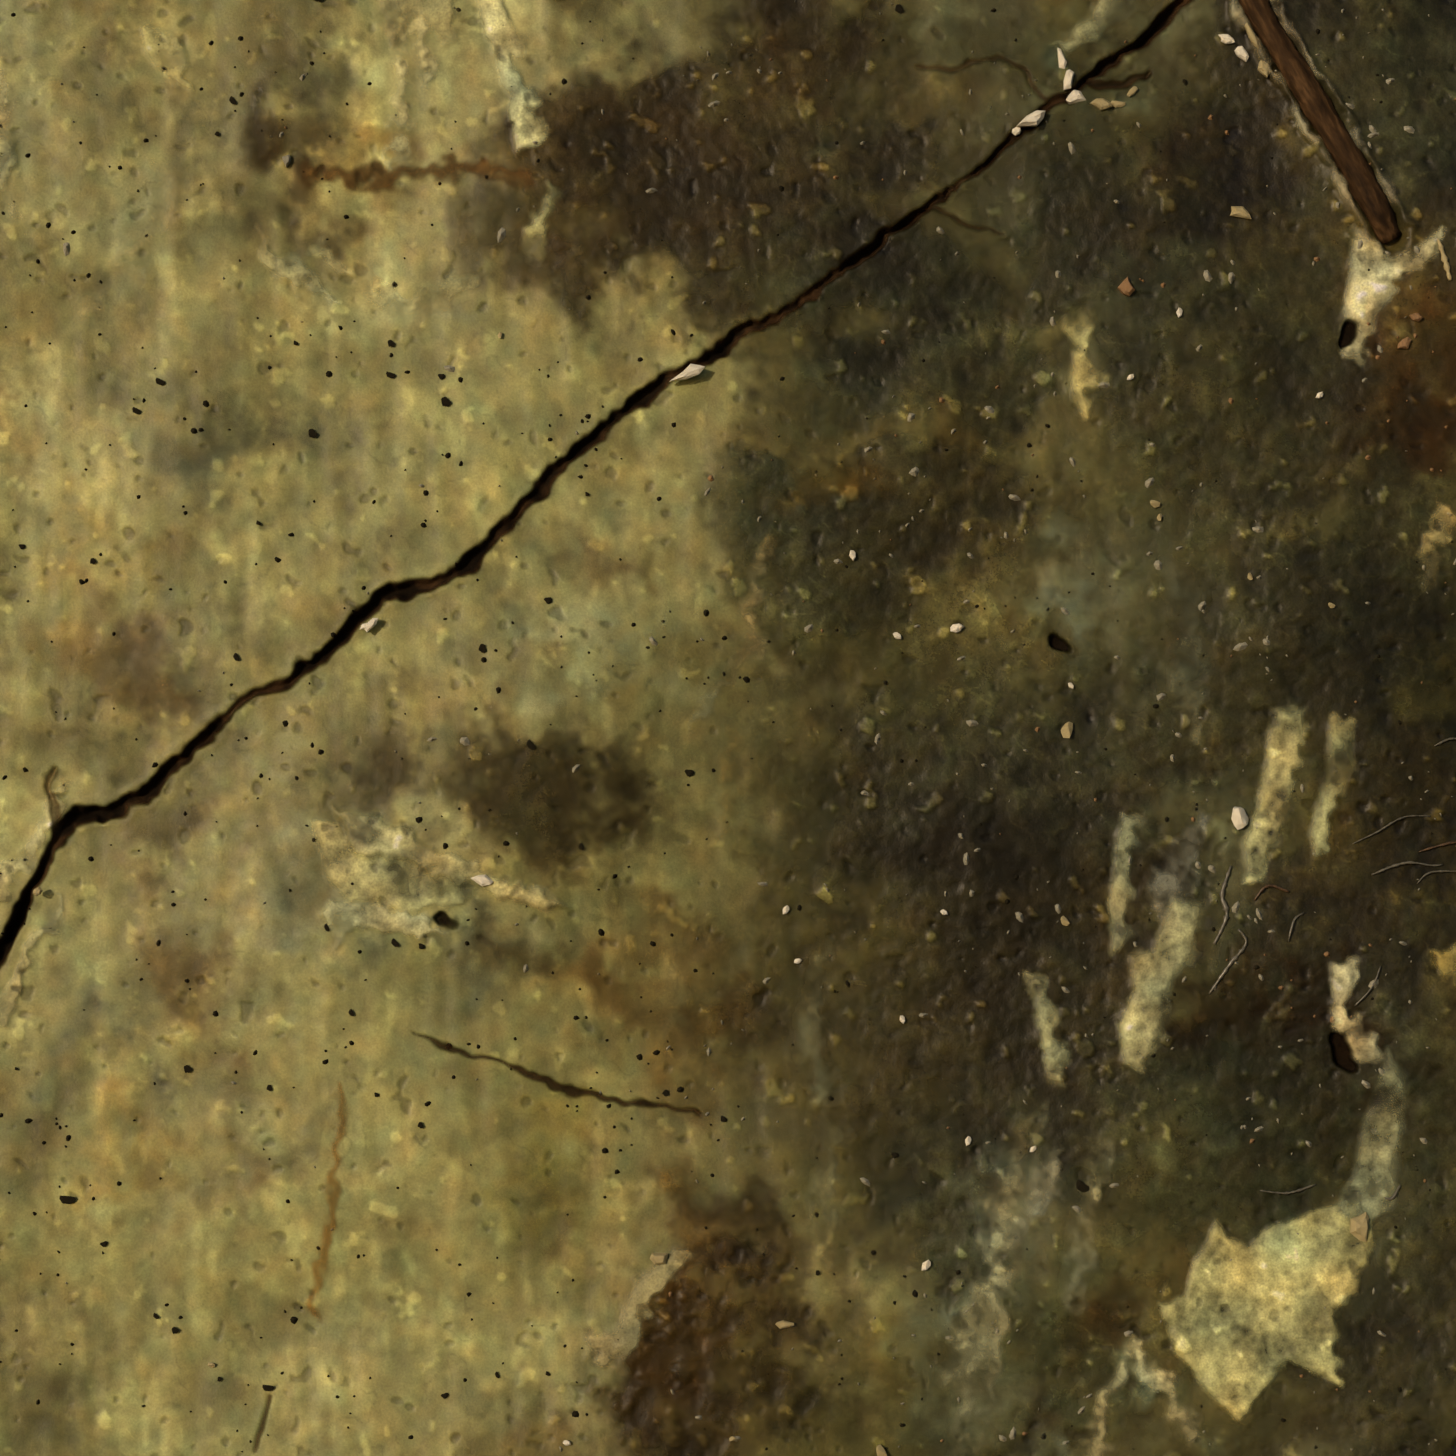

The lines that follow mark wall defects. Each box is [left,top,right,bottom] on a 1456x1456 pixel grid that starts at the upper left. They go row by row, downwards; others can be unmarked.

leakage [229,71,286,168]
corrosion [302,154,533,190]
spalling [1339,228,1443,356]
crack [0,0,1191,966]
leakage [438,0,1456,1456]
spalling [313,811,555,937]
crack [414,1033,700,1116]